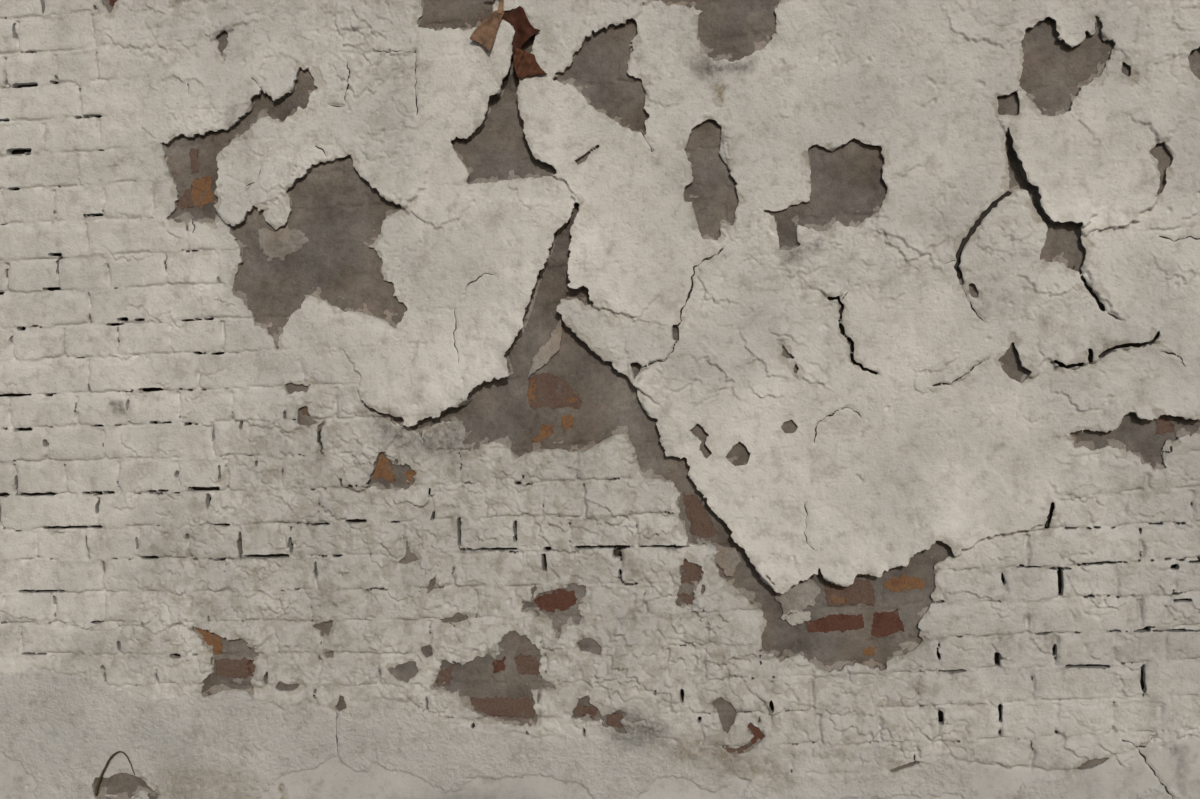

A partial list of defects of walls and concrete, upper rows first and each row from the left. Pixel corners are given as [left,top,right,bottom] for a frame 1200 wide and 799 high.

crack [944,191,1011,323]
peeling [163,0,1200,672]
crack [828,291,877,375]
crack [1053,266,1186,369]
peeling [194,627,259,697]
peeling [388,630,556,733]
peeling [93,773,159,799]